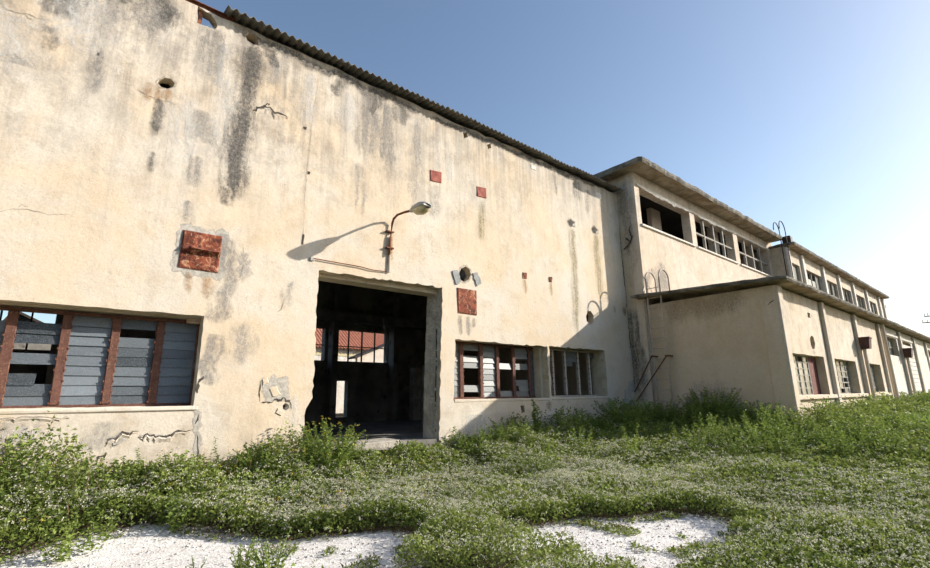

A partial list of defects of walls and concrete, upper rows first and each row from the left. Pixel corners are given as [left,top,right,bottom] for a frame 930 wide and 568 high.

damp [152,99,164,132]
damp [201,29,284,205]
crack [252,103,288,120]
peeling [262,375,290,416]
crack [97,415,199,463]